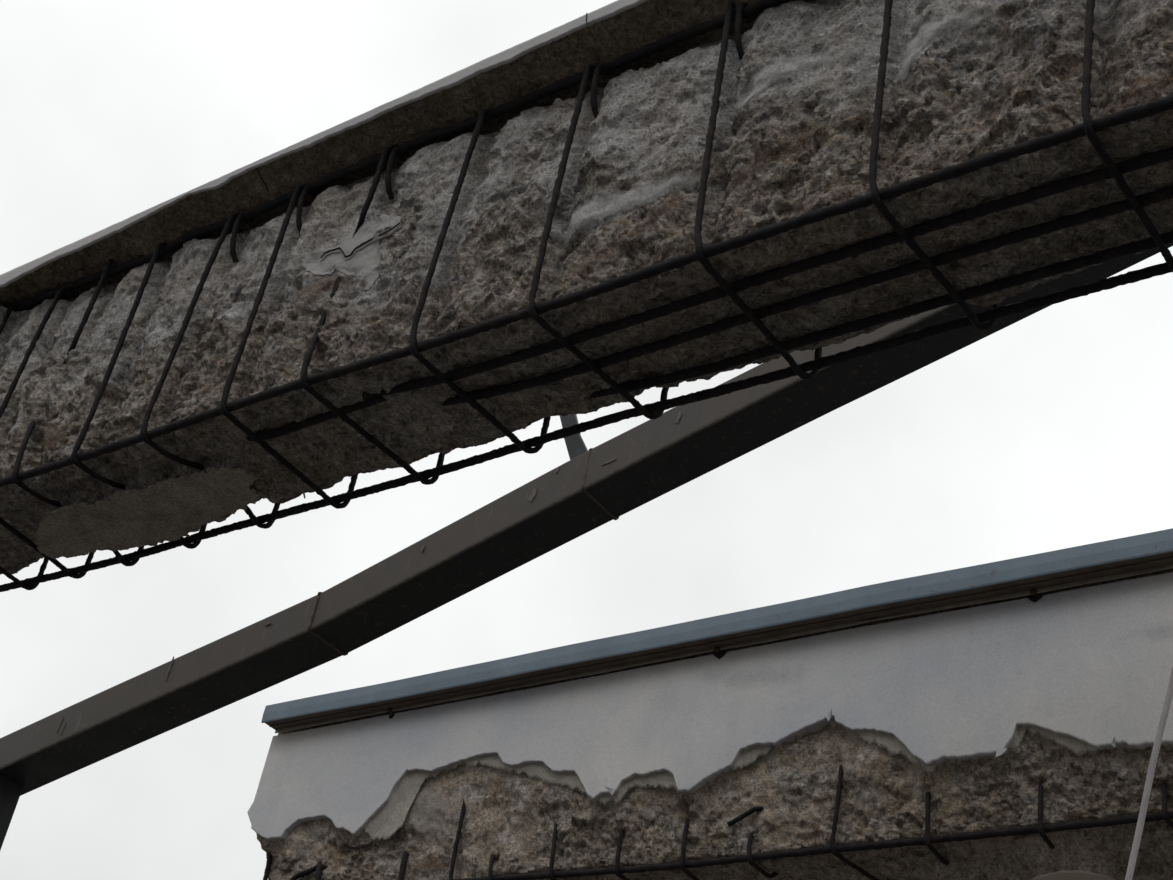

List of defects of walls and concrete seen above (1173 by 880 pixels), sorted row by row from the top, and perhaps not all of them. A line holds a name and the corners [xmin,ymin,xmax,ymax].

spalling [0,0,1173,592]
spalling [278,569,1173,735]
spalling [256,709,1173,880]